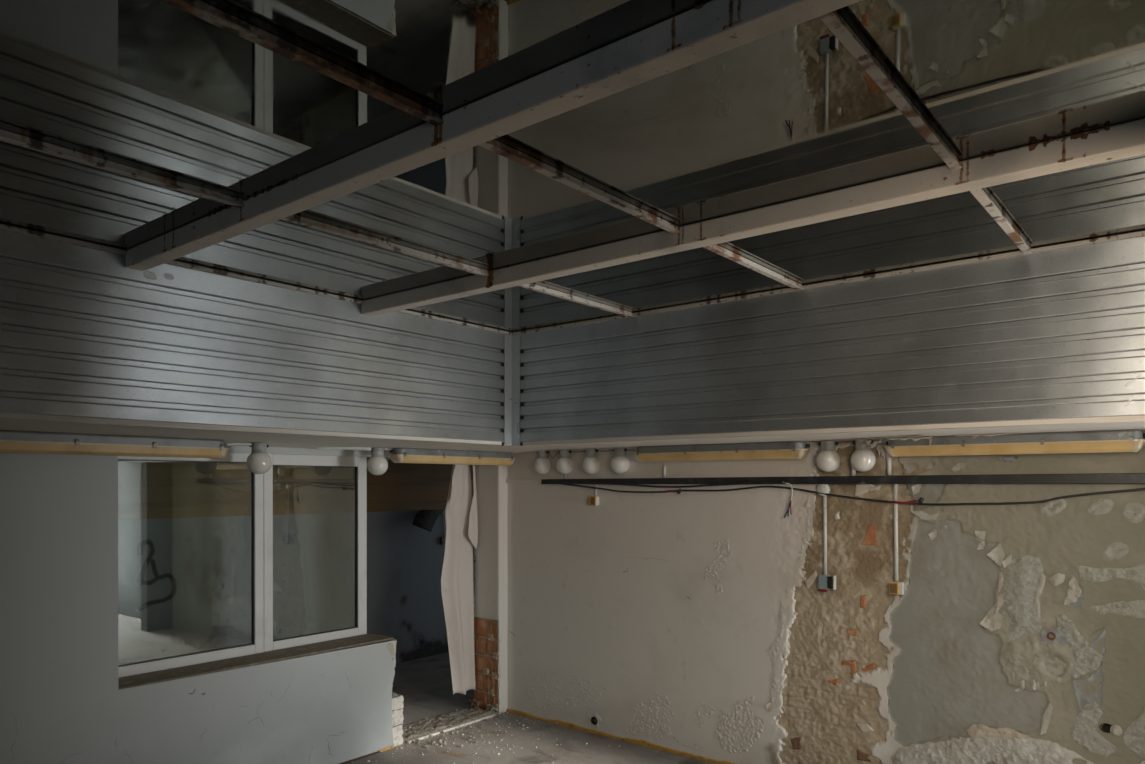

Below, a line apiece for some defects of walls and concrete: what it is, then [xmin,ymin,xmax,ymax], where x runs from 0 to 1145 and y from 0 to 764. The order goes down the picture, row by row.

spalling [765,435,1094,764]
flaking render [469,617,499,712]
spalling [1099,723,1122,737]